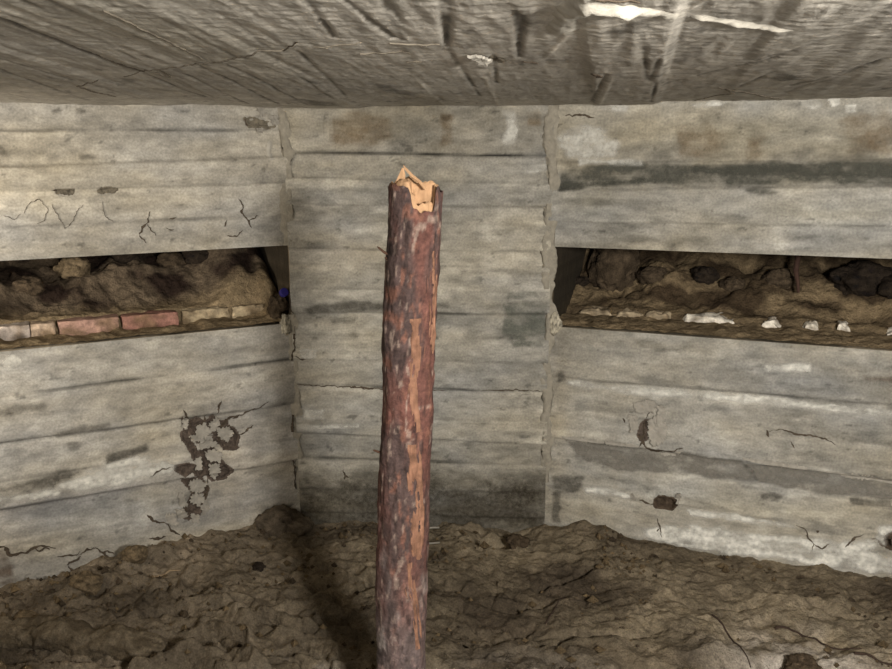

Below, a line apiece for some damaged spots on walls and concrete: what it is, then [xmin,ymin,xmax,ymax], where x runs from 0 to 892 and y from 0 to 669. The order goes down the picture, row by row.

crack [594,0,640,8]
crack [56,10,439,78]
spalling [243,107,279,133]
leakage [559,127,892,194]
crack [139,212,176,243]
crack [224,200,258,237]
spalling [151,401,268,526]
peeling [562,399,892,499]
crack [766,429,835,447]
spalling [630,493,682,511]
spalling [872,531,892,550]
crack [0,545,114,571]